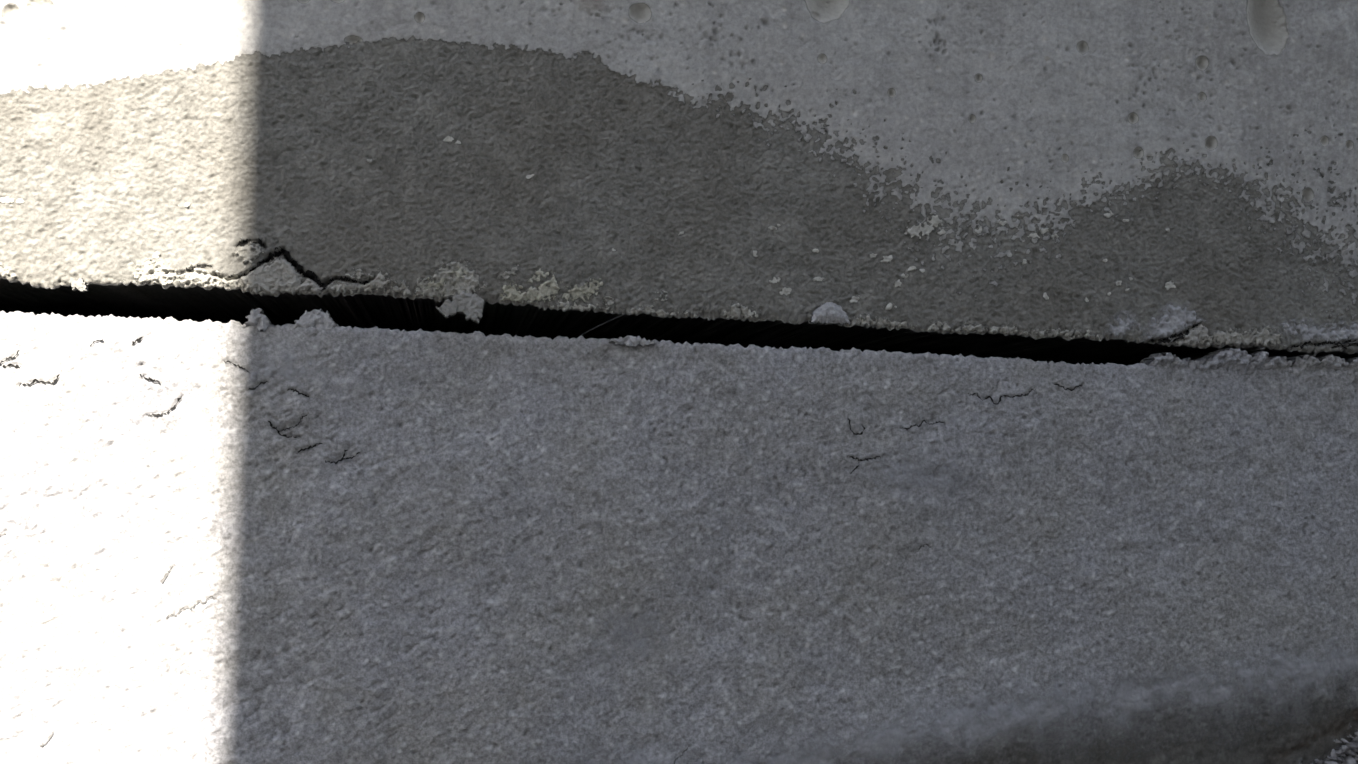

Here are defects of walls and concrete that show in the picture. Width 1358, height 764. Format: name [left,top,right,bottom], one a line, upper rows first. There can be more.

damp [0,36,1358,380]
spalling [133,238,418,297]
crack [1150,323,1199,344]
crack [1287,339,1358,351]